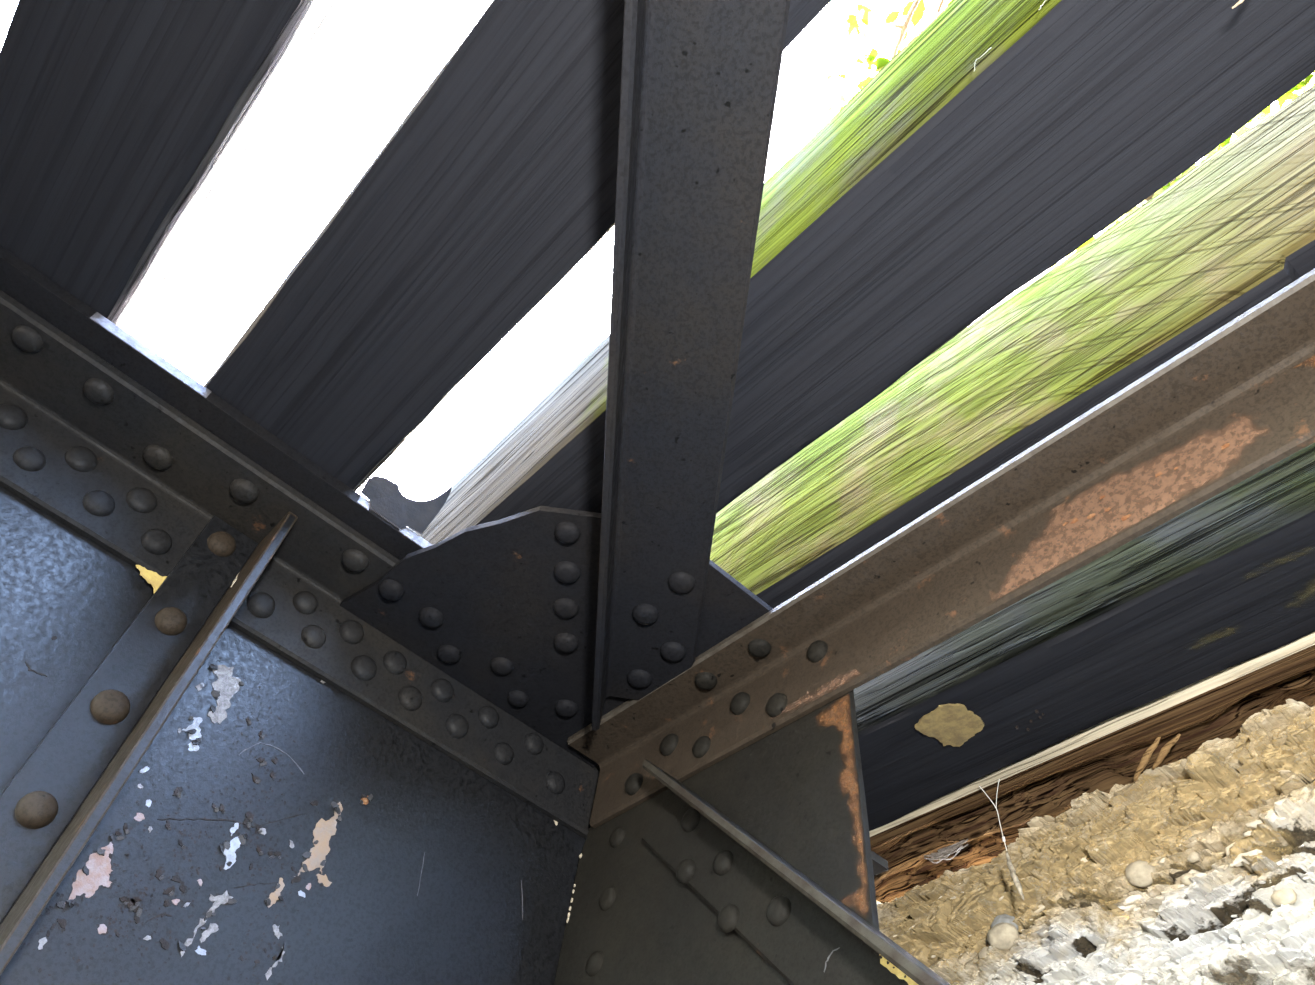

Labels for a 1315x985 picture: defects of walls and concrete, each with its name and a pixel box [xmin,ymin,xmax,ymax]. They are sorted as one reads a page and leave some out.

rust [992,416,1267,601]
peeling [182,664,245,752]
rust [773,671,869,915]
peeling [56,834,114,909]
peeling [219,823,248,870]
peeling [264,801,343,908]
peeling [178,891,237,951]
peeling [265,924,285,980]